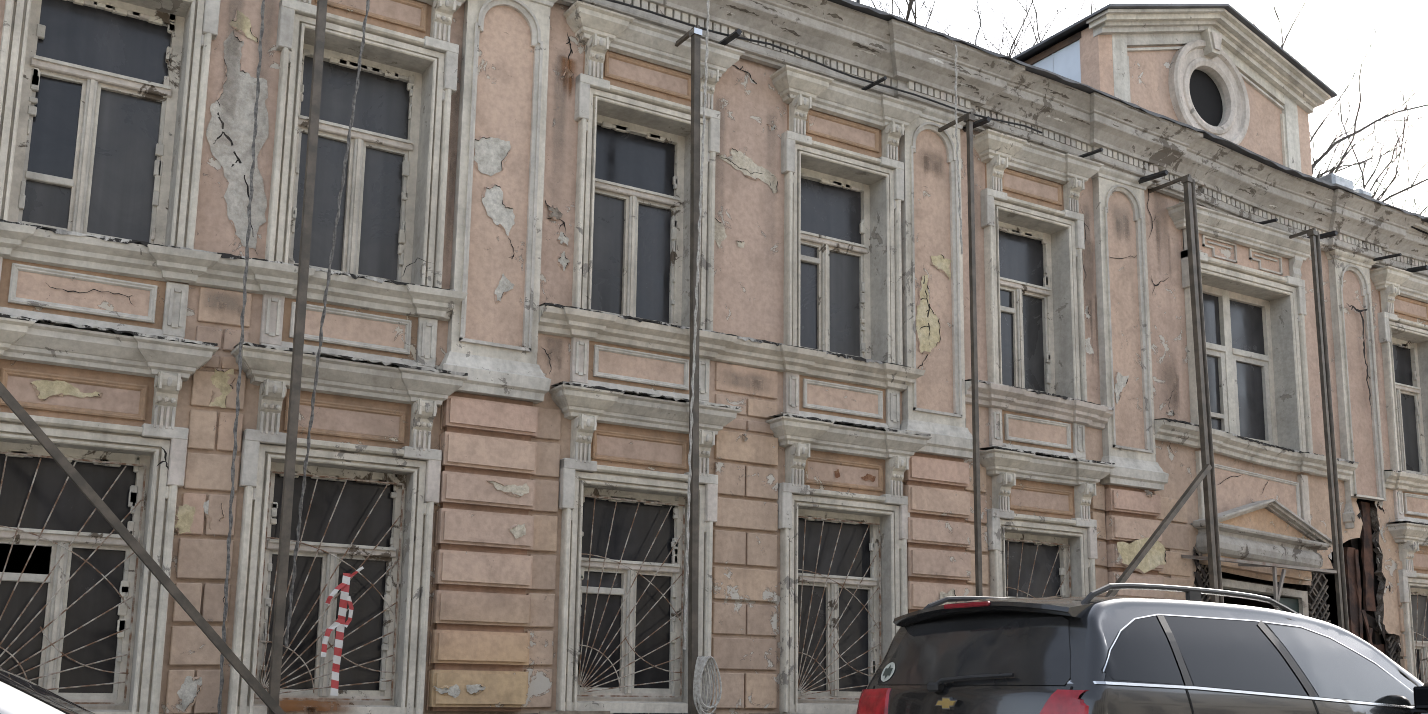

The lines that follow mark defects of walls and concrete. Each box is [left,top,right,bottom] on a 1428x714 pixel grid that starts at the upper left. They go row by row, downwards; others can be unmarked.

peeling [206,8,269,249]
peeling [473,135,515,236]
peeling [716,148,779,194]
peeling [916,254,951,355]
peeling [30,380,103,401]
peeling [487,480,529,498]
peeling [1117,523,1206,588]